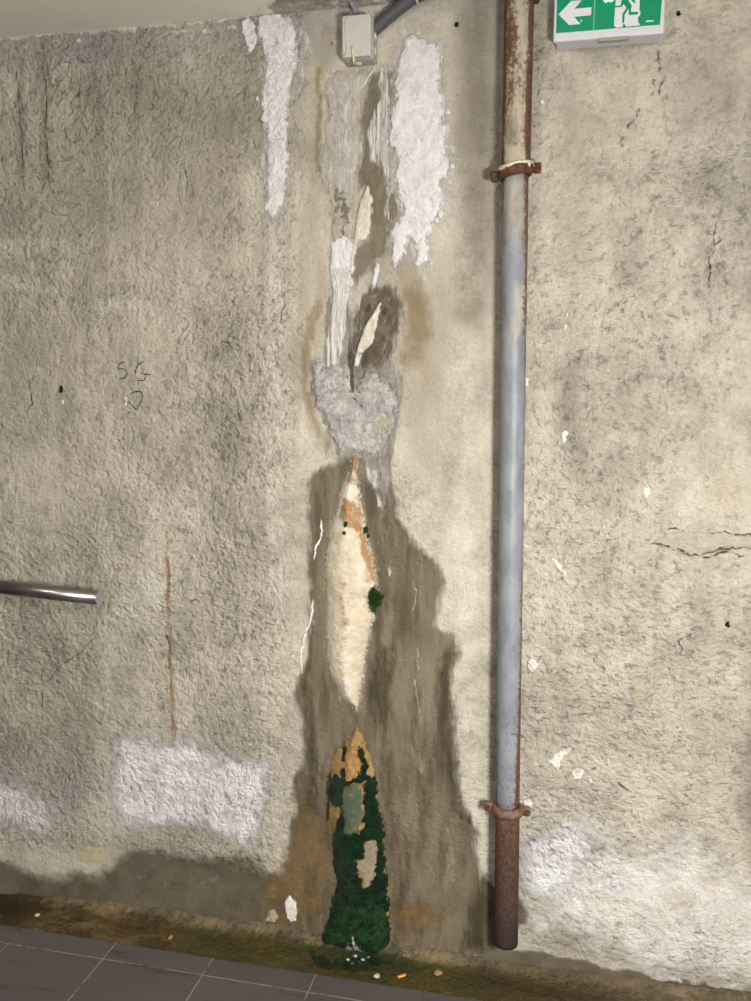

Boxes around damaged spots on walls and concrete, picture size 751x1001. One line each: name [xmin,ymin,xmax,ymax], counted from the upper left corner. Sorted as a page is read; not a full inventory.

damp [241,13,313,225]
spalling [330,183,353,236]
damp [310,186,401,457]
spalling [348,285,401,369]
damp [353,19,460,276]
damp [0,457,751,991]